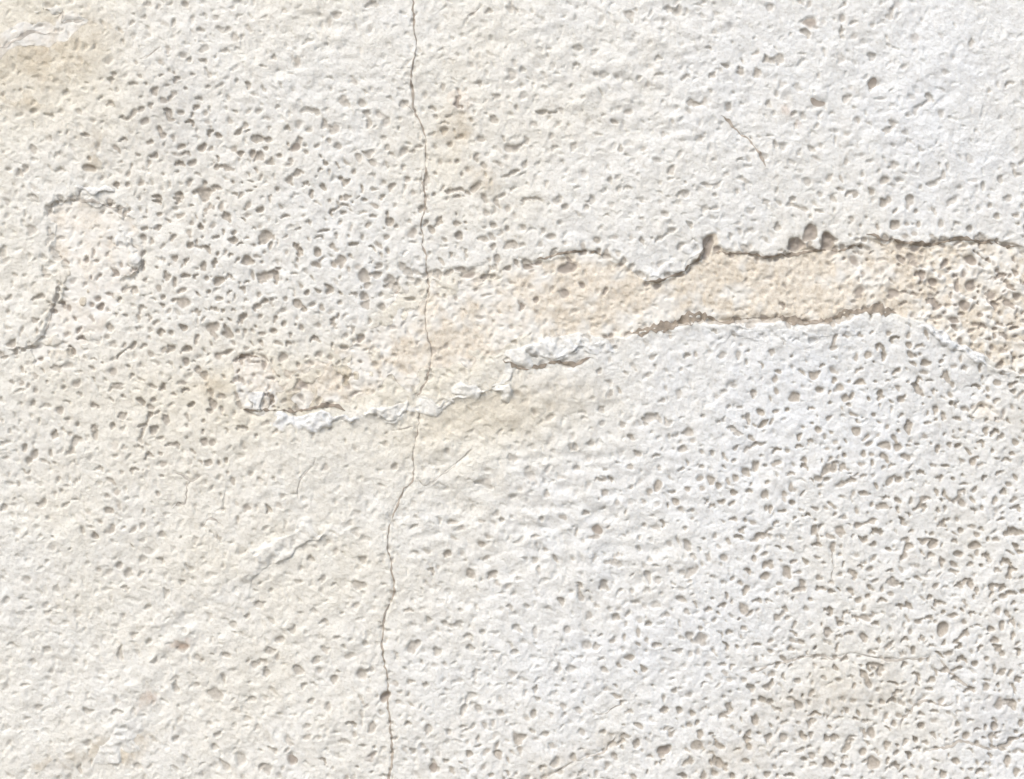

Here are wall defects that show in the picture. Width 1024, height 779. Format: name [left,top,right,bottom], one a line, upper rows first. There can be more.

crack [380,0,471,779]
spalling [232,233,1024,434]